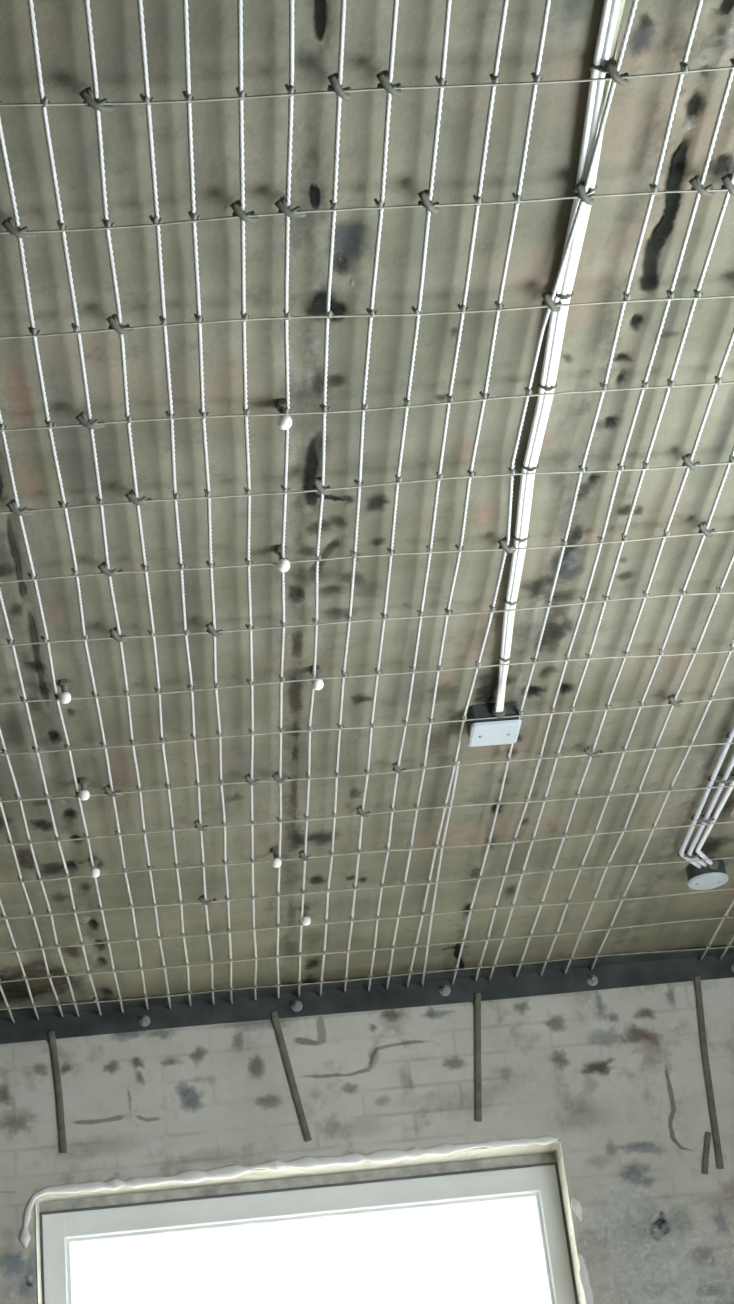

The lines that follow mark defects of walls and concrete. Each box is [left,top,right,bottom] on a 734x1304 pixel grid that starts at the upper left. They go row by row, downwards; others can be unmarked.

damp [0,947,79,1000]
crack [665,1070,685,1149]